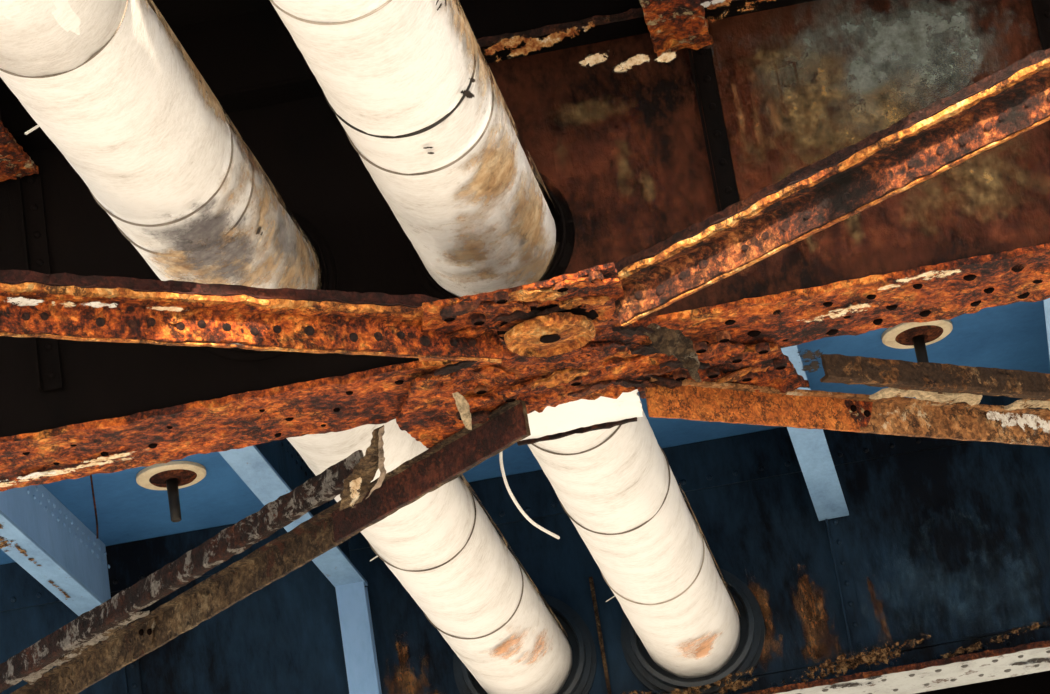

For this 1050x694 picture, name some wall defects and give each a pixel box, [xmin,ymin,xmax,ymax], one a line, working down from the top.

rust [701,0,776,22]
rust [484,22,595,62]
rust [579,52,677,72]
rust [808,151,1048,258]
rust [895,325,943,346]
peeling [0,449,147,487]
rust [149,469,197,488]
peeling [349,477,362,506]
peeling [0,524,41,566]
rust [751,585,780,661]
rust [795,565,838,660]
rust [390,636,438,694]